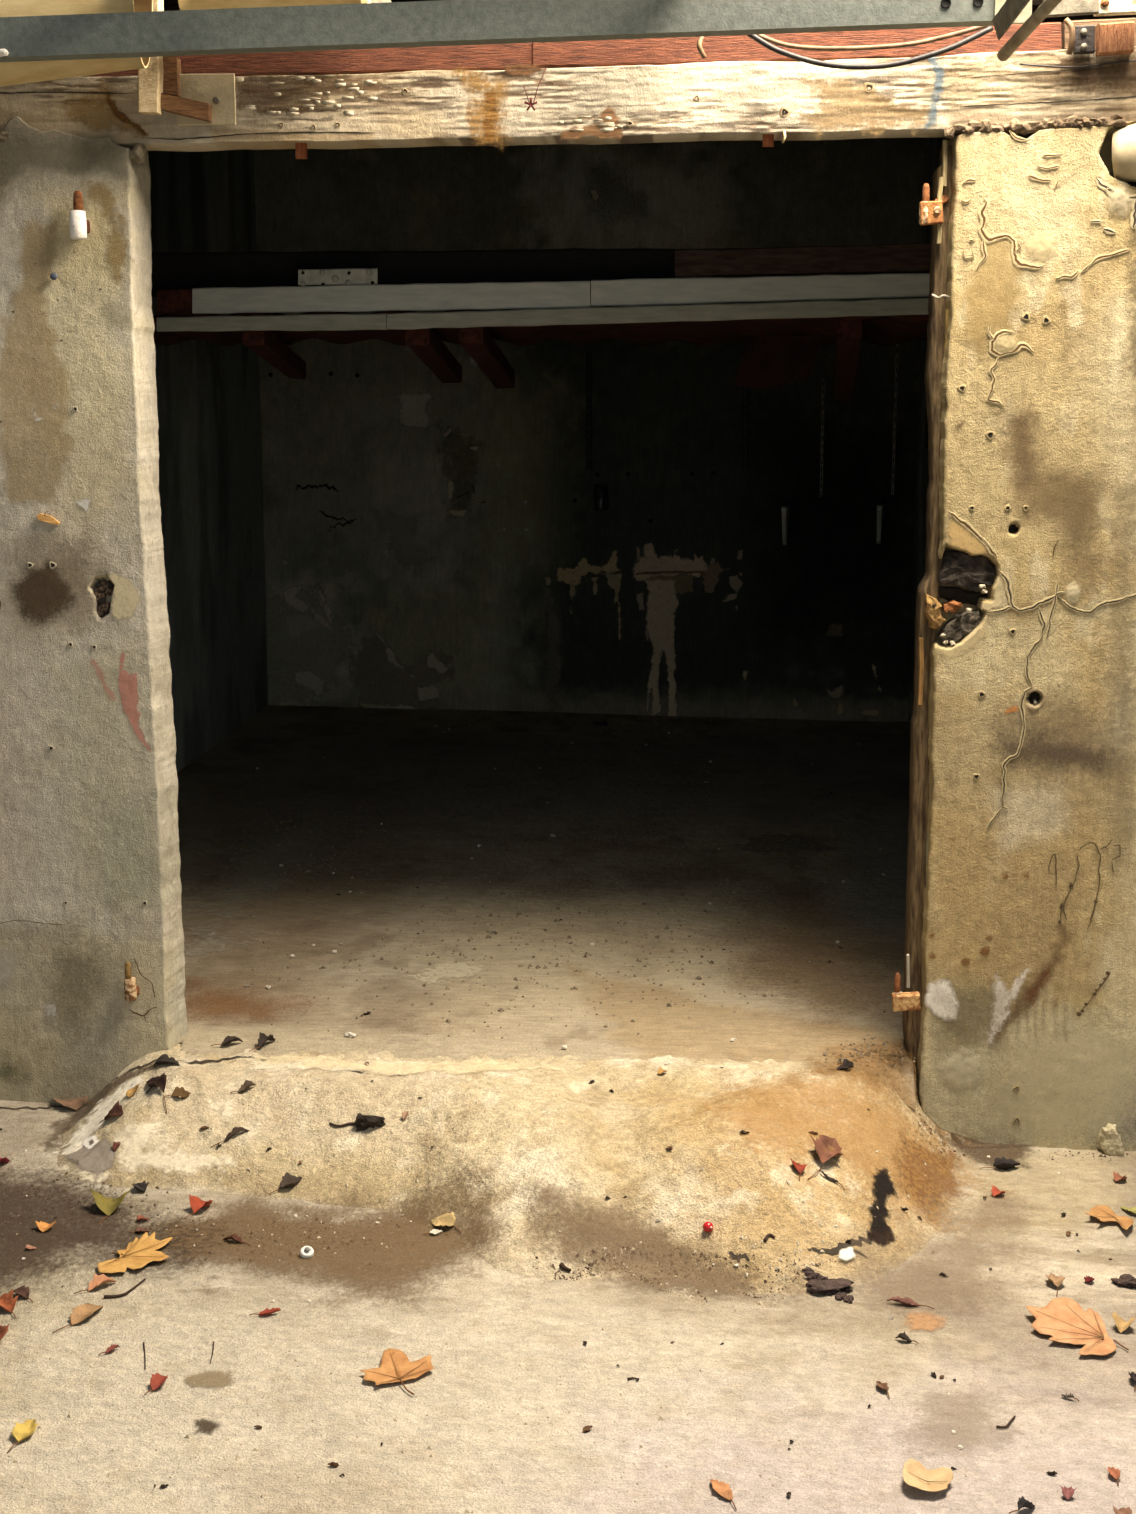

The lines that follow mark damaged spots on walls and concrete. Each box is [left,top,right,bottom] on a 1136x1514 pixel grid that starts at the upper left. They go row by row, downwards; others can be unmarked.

corrosion [452,68,508,143]
crack [950,67,1136,189]
crack [961,176,1136,281]
crack [987,324,1034,407]
damp [15,564,75,622]
flaking render [923,522,1004,657]
crack [948,512,1136,828]
damp [0,1167,500,1300]